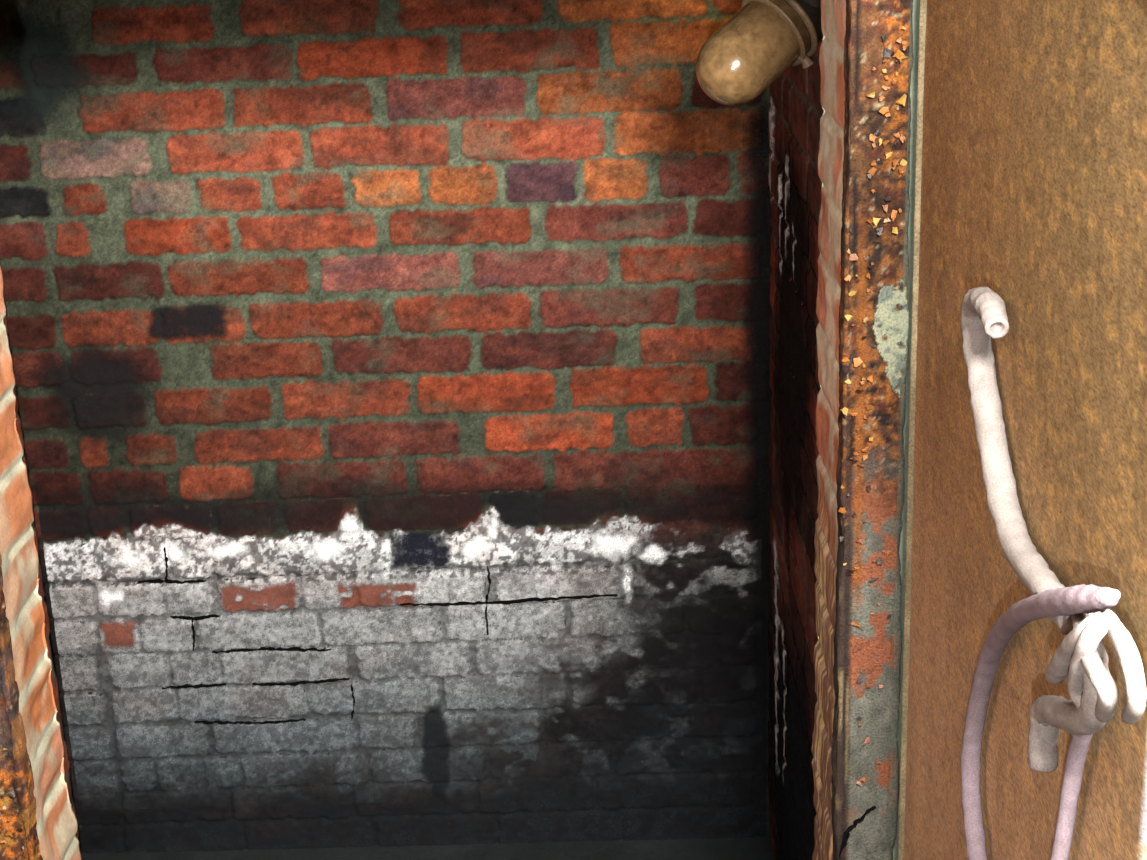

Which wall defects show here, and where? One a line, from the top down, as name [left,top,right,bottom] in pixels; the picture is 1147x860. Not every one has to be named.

rust [867,26,909,117]
rust [867,129,907,236]
rust [844,249,874,296]
rust [842,357,874,392]
rust [840,405,874,467]
damp [44,508,817,860]
rust [0,790,23,855]